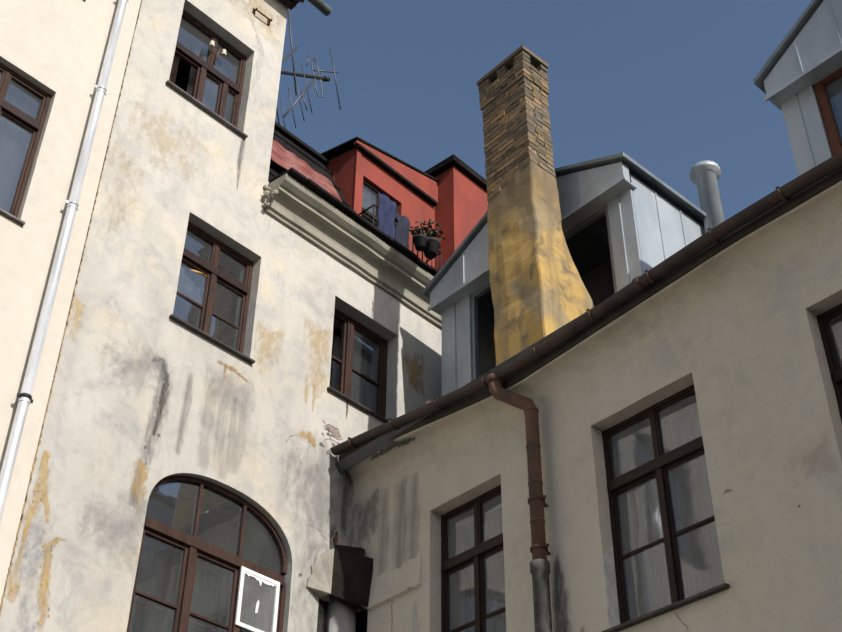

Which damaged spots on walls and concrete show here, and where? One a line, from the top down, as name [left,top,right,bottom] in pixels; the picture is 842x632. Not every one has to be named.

damp [144,375,169,449]
spalling [286,423,343,455]
peeling [19,451,51,560]
peeling [38,538,59,624]